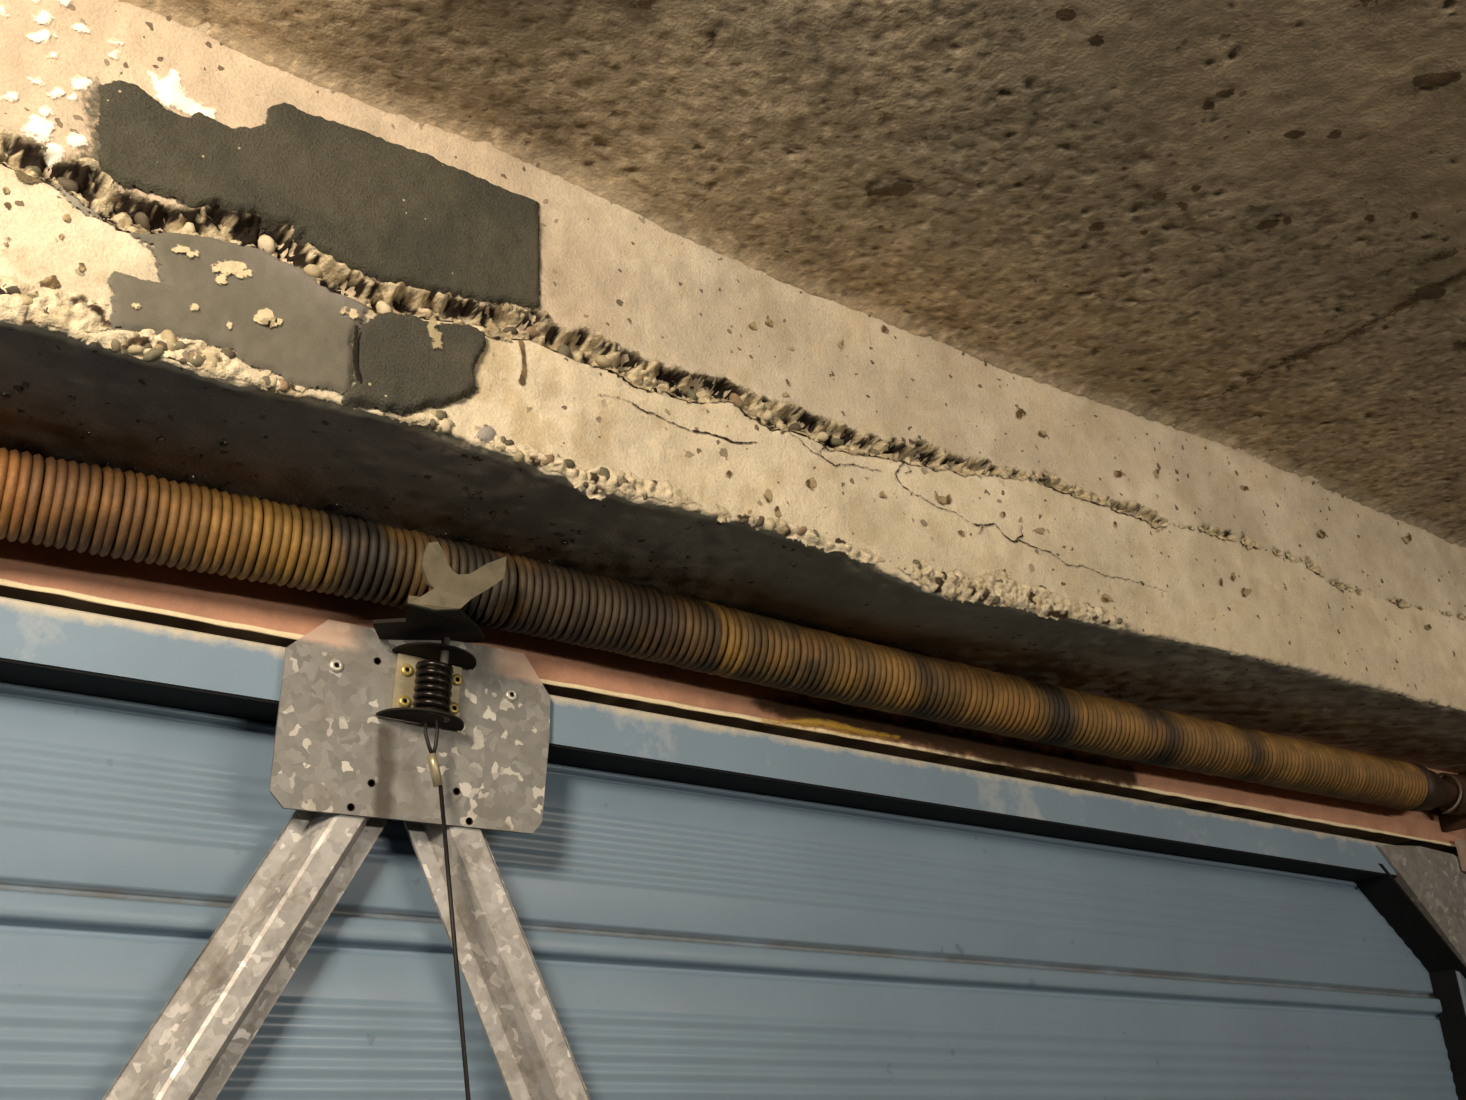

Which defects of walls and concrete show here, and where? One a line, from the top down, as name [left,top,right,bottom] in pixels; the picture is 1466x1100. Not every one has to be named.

spalling [0,275,305,393]
spalling [383,409,455,434]
crack [0,126,1466,619]